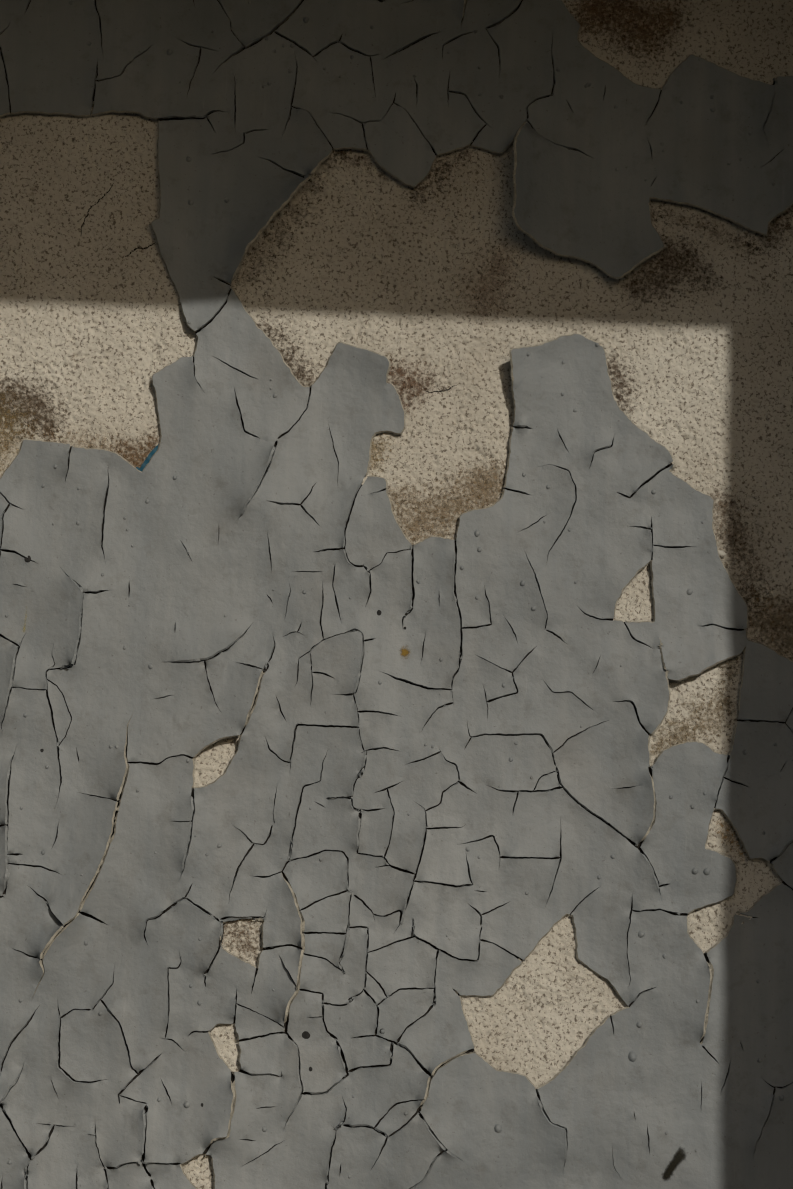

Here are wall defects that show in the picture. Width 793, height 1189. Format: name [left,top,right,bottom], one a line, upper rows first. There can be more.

crack [159,0,523,155]
leakage [571,0,691,64]
leakage [0,376,66,471]
crack [193,278,339,521]
peeling [0,0,793,682]
crack [619,463,673,498]
leakage [710,492,793,659]
peeling [106,661,266,974]
peeling [554,620,793,1021]
crack [610,883,687,1034]
peeling [144,1024,240,1189]
peeling [402,915,627,1176]